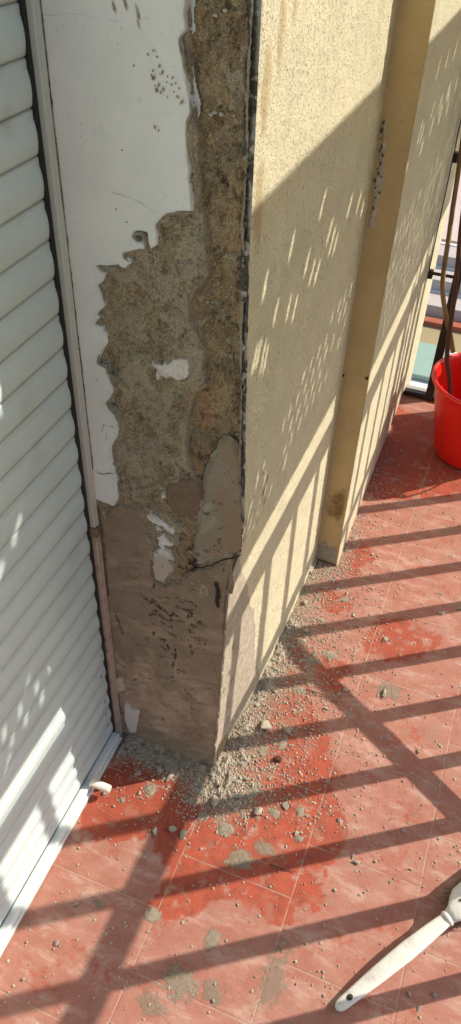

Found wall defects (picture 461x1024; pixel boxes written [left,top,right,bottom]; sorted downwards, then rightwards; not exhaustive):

flaking render [96,0,262,626]
crack [179,548,241,608]